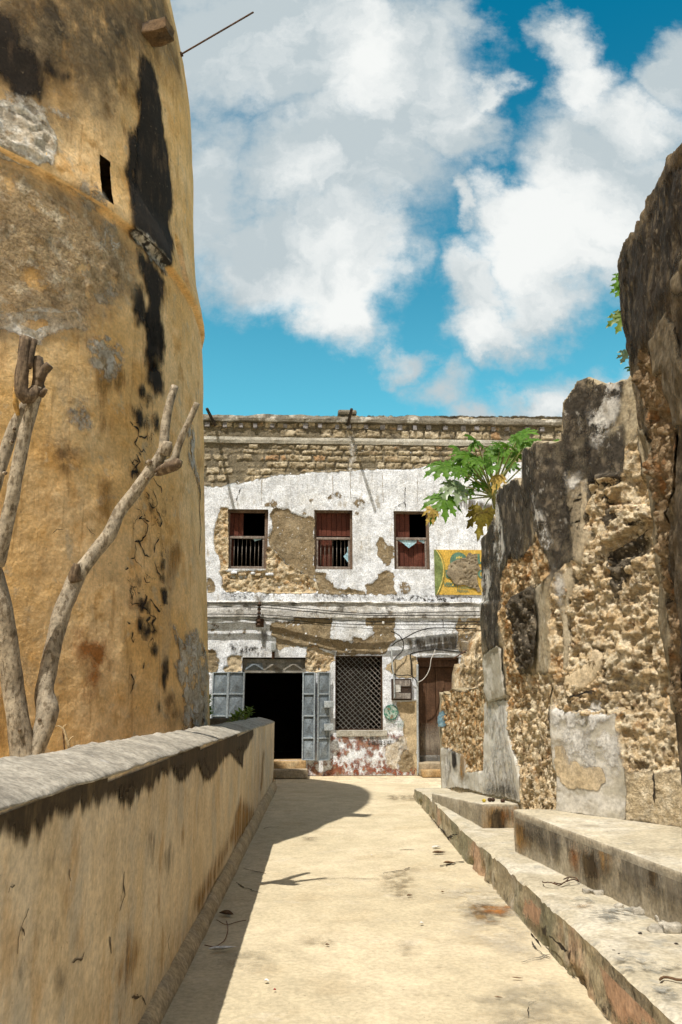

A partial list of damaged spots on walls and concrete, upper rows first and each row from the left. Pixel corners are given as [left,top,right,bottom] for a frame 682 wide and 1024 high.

flaking render [0,92,167,379]
damp [0,0,179,430]
crack [125,404,167,691]
flaking render [174,624,246,729]
spalling [207,492,410,601]
flaking render [270,618,418,679]
spalling [456,618,480,657]
spalling [497,348,682,828]
damp [0,730,254,842]
peeling [307,734,417,776]